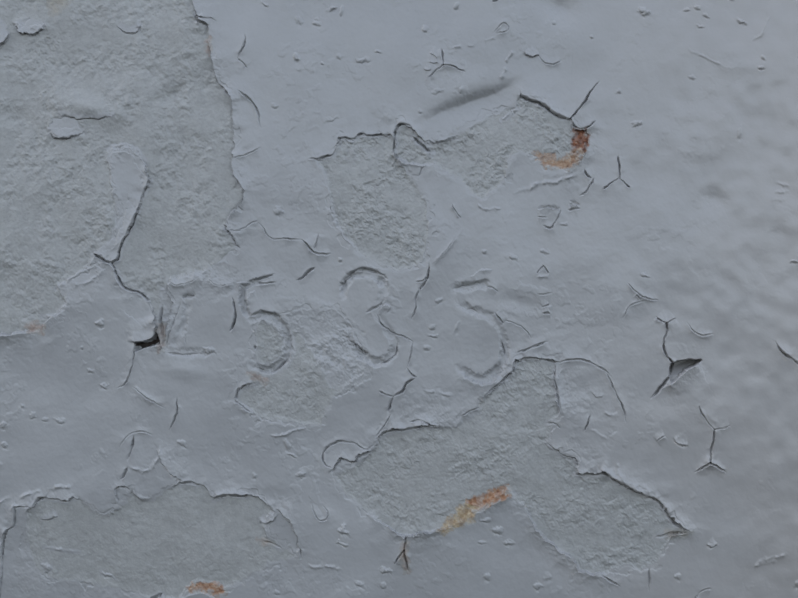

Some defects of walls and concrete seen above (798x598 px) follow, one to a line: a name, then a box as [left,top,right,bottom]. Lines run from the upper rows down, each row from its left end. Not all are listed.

peeling [0,0,257,344]
peeling [305,78,603,270]
rust [531,126,592,172]
crack [576,153,633,201]
spalling [135,336,160,349]
crack [363,200,464,440]
crack [620,280,708,402]
crack [772,338,798,367]
peeling [319,354,694,591]
crack [690,403,734,477]
rust [435,483,513,537]
rust [185,580,229,598]